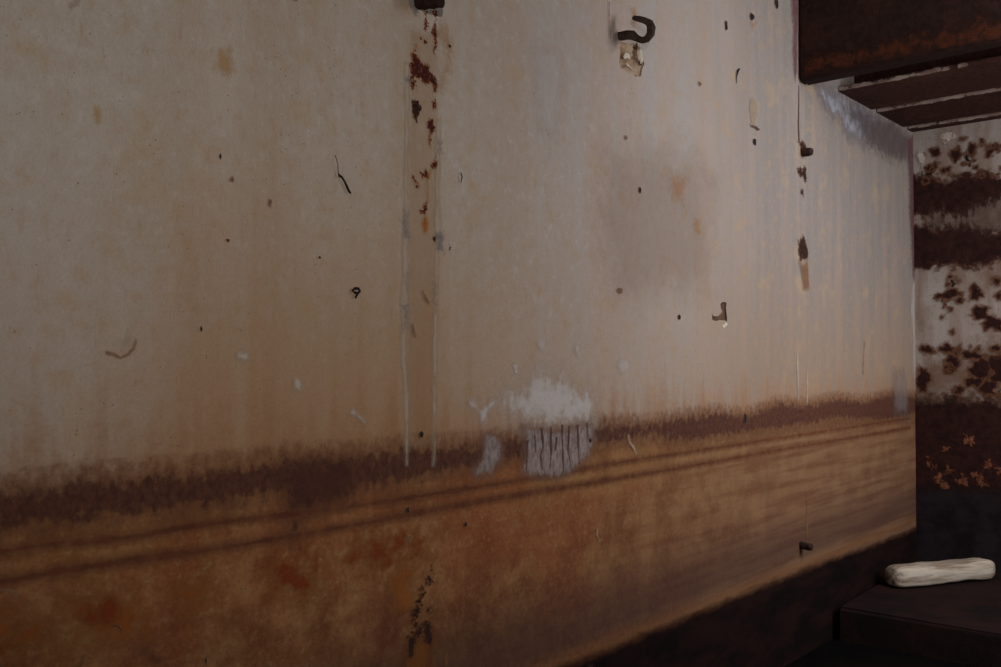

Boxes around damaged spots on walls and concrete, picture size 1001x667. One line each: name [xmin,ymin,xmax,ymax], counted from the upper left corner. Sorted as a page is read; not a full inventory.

rust [803,16,1001,76]
rust [913,136,1001,332]
leakage [0,364,915,587]
rust [915,329,1001,490]